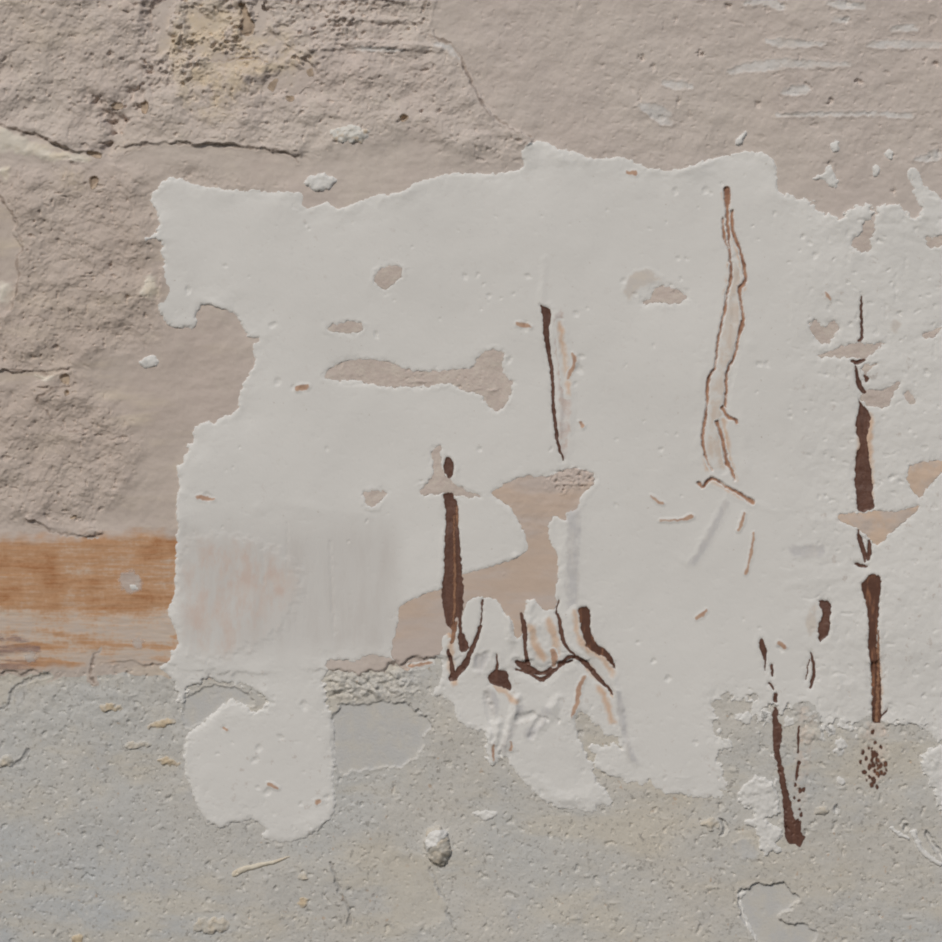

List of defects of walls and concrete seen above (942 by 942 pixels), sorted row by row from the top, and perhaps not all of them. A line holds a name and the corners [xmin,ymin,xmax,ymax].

peeling [325,350,513,411]
crack [540,305,564,461]
crack [694,185,757,507]
rust [0,514,308,682]
peeling [391,446,594,671]
crack [441,457,615,695]
crack [851,296,888,789]
peeling [838,460,942,545]
spalling [179,682,258,732]
crack [759,639,805,847]
rust [856,640,894,788]
spalling [735,878,822,942]